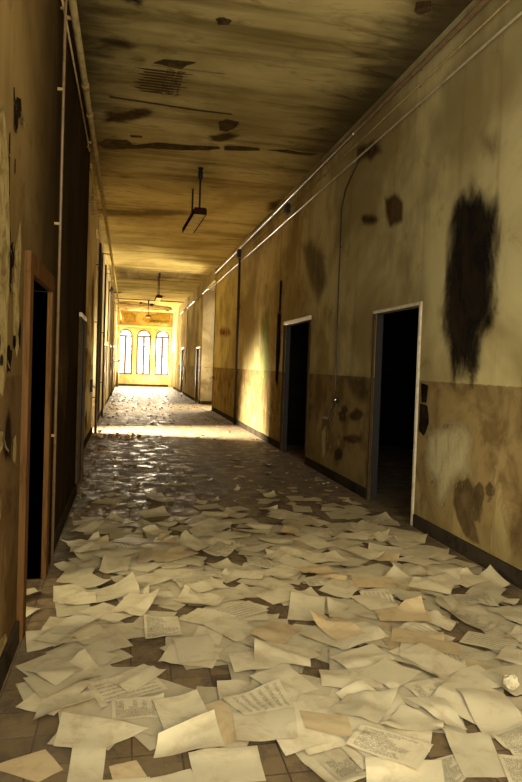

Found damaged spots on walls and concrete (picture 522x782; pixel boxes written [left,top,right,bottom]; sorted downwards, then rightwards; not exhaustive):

peeling [0,97,27,397]
water stain [443,191,500,383]